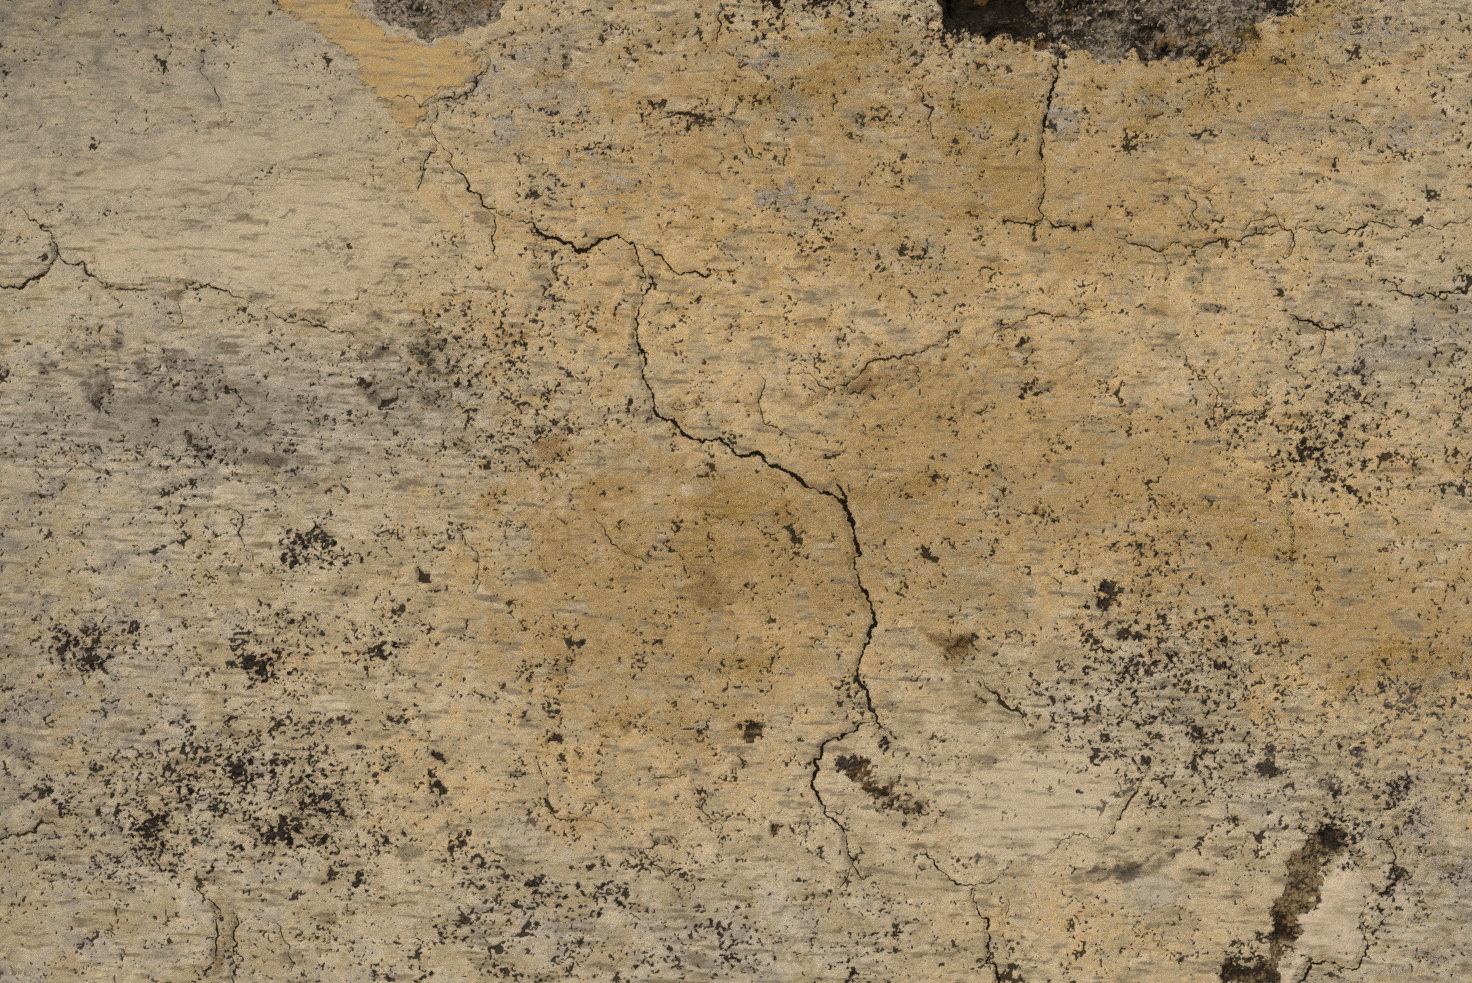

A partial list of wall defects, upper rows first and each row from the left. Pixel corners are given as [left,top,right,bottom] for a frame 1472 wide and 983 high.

flaking render [937,0,1284,71]
crack [0,210,354,338]
crack [389,57,1092,889]
crack [1051,771,1150,854]
crack [920,846,1010,983]
peeling [1219,826,1375,983]